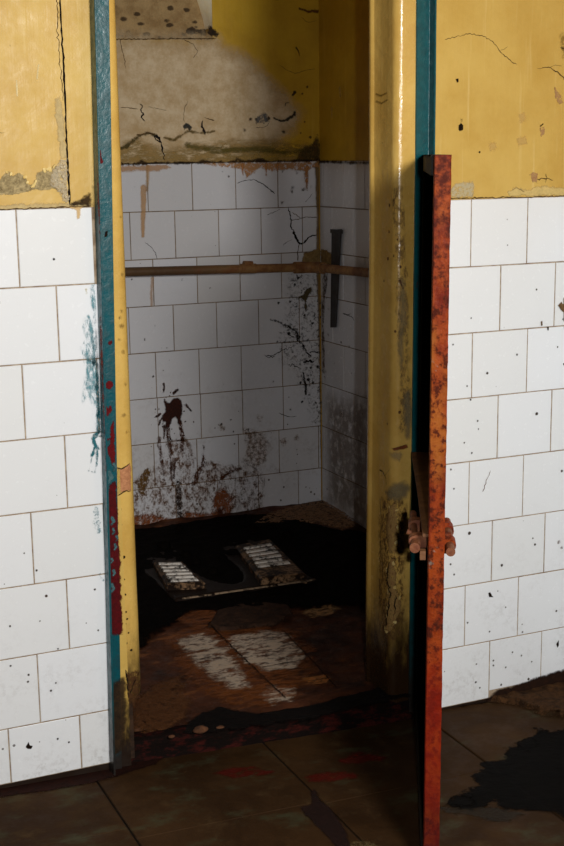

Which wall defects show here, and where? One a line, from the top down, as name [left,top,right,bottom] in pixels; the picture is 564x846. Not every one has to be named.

crack [445,33,516,64]
crack [121,104,165,160]
peeling [116,37,296,164]
crack [273,102,296,133]
flaking render [0,158,70,205]
crack [239,179,317,260]
leakage [138,469,150,495]
leakage [155,383,194,518]
peeling [378,484,409,639]
leakage [441,727,564,822]